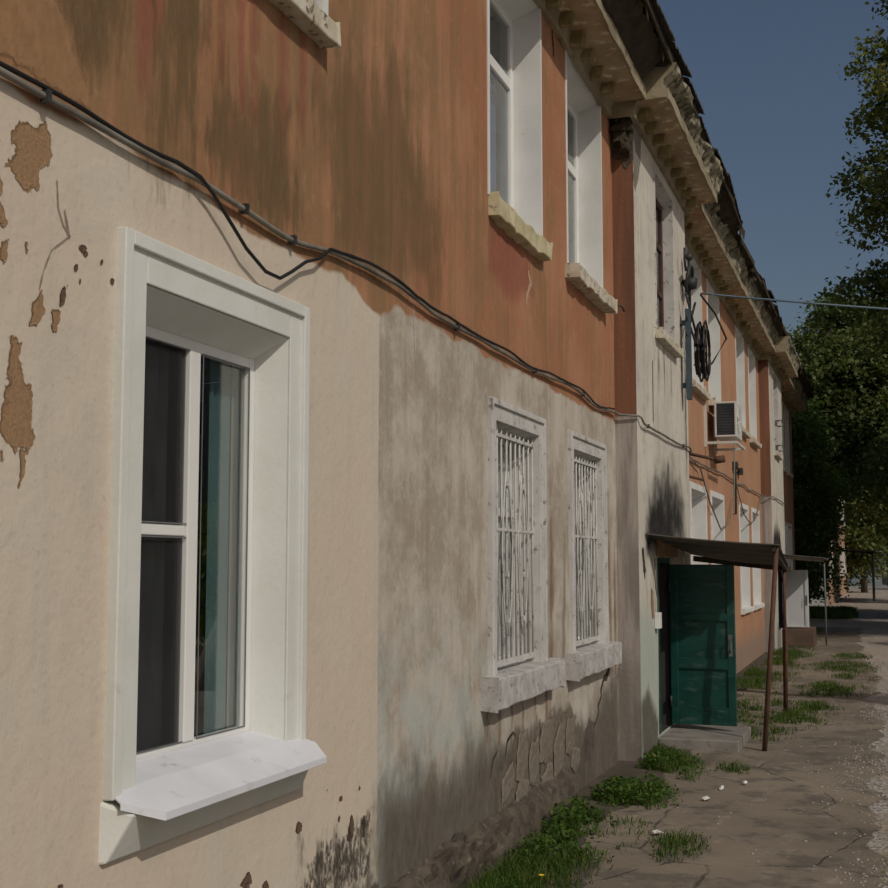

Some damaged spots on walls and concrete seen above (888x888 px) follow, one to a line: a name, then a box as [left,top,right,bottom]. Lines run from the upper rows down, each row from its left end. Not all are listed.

peeling [0,120,53,192]
peeling [0,178,8,227]
peeling [0,238,9,263]
crack [39,180,71,290]
peeling [29,285,68,332]
peeling [0,335,36,488]
flaking render [496,706,581,812]
damp [566,679,619,794]
crack [586,668,610,759]
damp [304,751,515,888]
peeling [240,872,252,888]